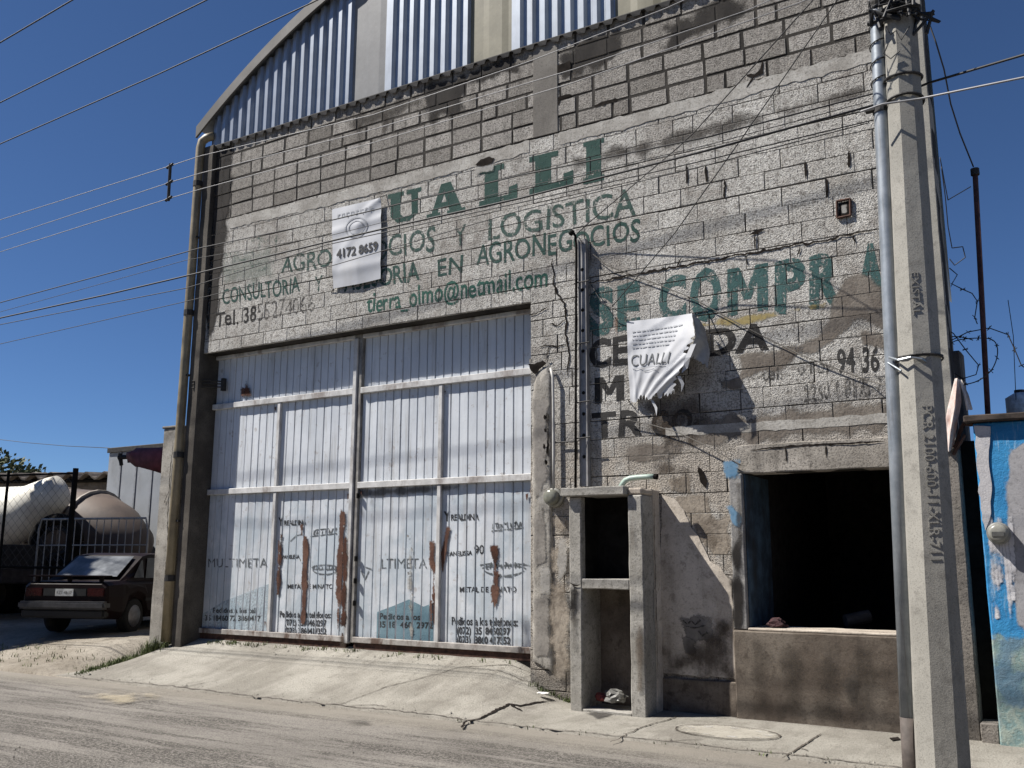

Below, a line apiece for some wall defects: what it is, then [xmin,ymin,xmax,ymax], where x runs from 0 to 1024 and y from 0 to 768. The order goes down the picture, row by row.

crack [530,258,570,376]
rust [299,524,309,624]
rust [335,510,345,636]
rust [429,526,450,627]
rust [490,545,499,607]